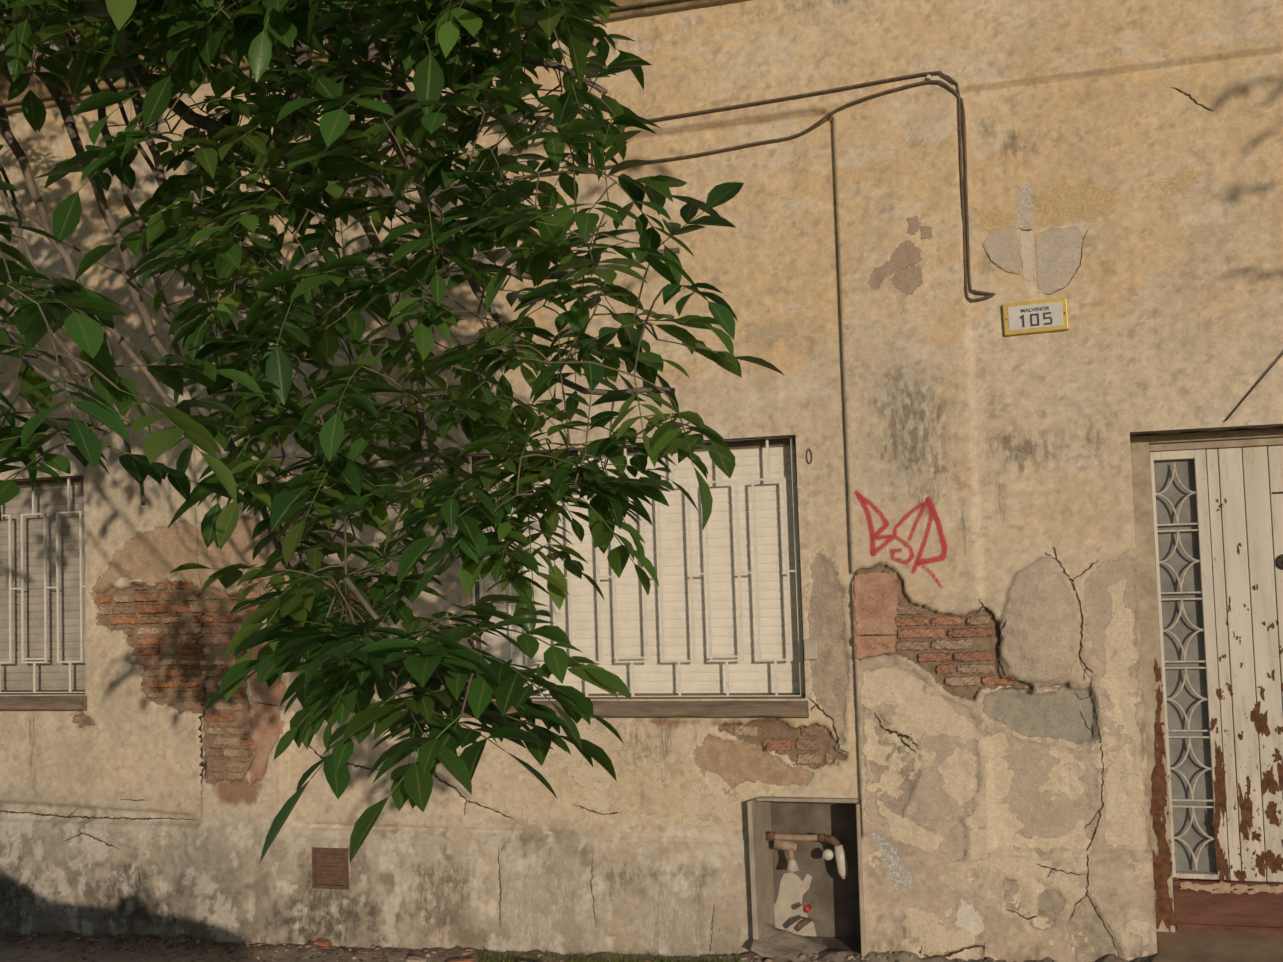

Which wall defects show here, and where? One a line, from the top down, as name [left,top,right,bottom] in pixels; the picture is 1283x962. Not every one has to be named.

peeling [867,217,933,295]
peeling [1015,183,1083,293]
spalling [90,515,295,785]
peeling [540,546,1283,962]
crack [1036,547,1119,957]
crack [1006,902,1039,920]